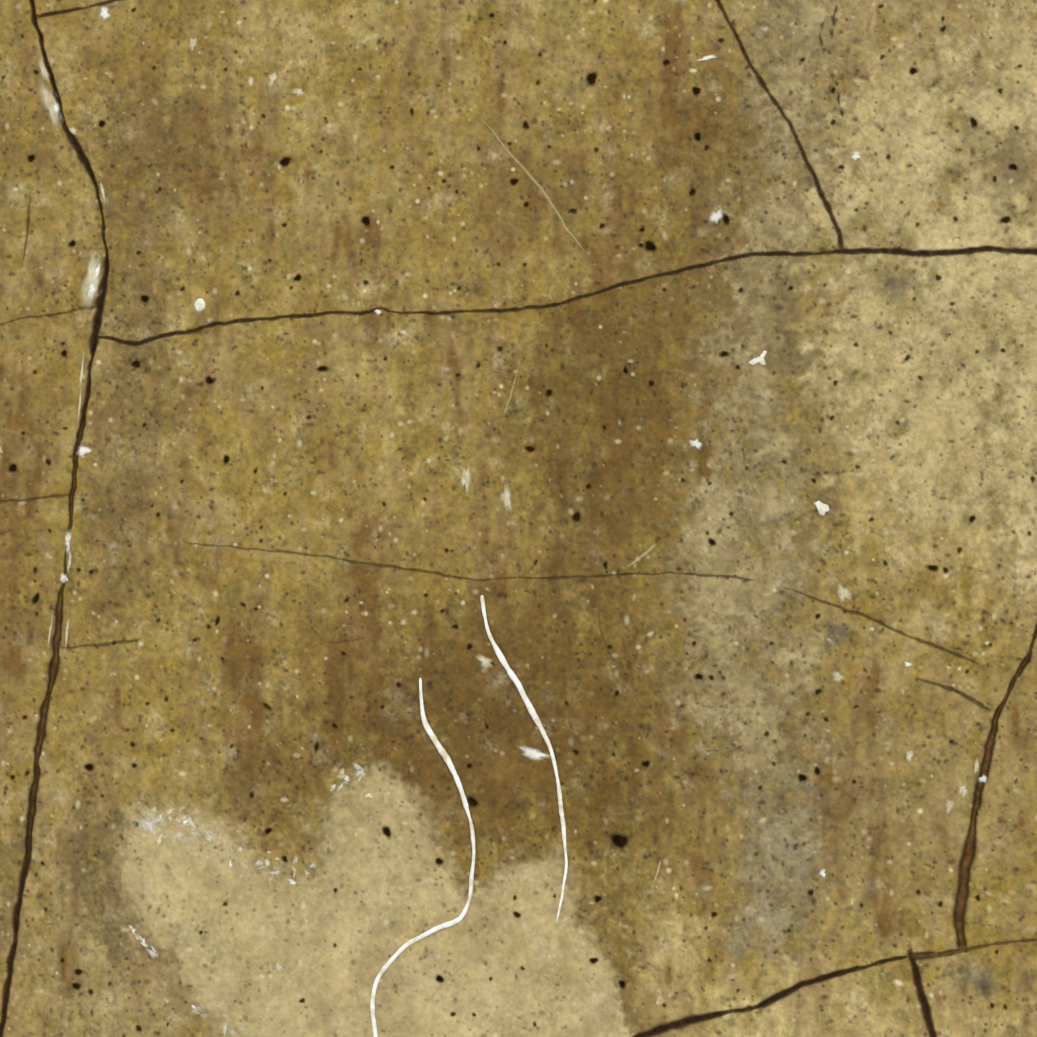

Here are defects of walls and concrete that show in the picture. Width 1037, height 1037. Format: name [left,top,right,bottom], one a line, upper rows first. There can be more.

crack [716,0,843,246]
crack [98,246,1037,346]
crack [0,0,118,1037]
crack [211,545,751,581]
crack [787,588,976,663]
crack [633,624,1037,1037]